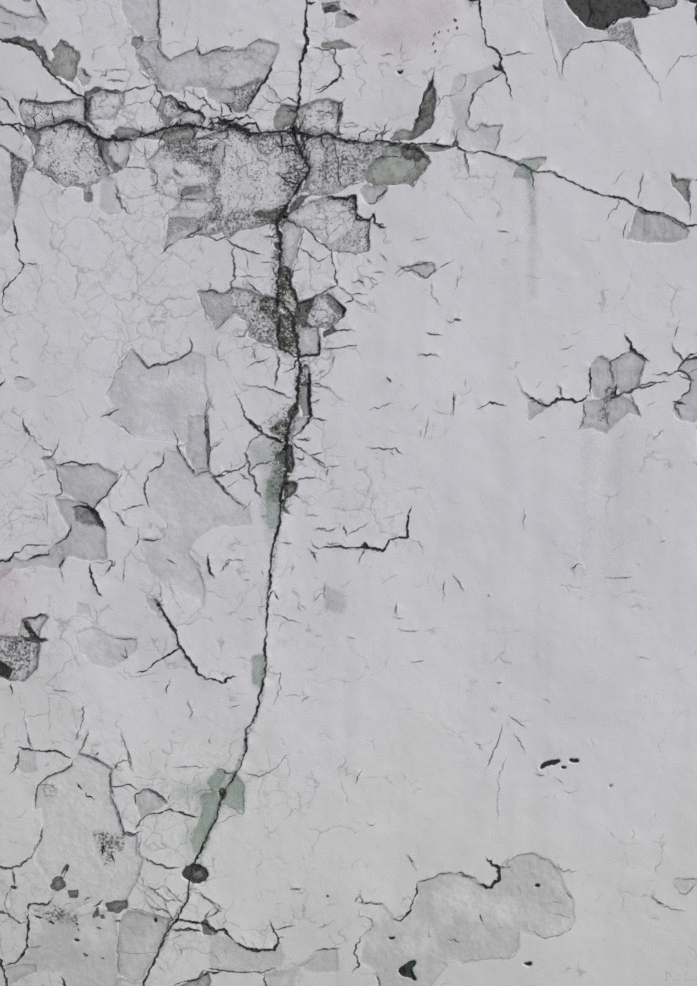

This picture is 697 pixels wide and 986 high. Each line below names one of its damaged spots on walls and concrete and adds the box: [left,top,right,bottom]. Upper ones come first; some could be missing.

peeling [122,0,279,113]
spalling [543,0,678,98]
spalling [0,39,456,439]
crack [521,163,697,243]
crack [479,345,696,438]
peeling [579,335,658,433]
peeling [0,438,126,597]
peeling [102,337,251,618]
crack [0,0,527,986]
spalling [0,613,49,694]
peeling [7,735,196,986]
peeling [353,852,575,986]